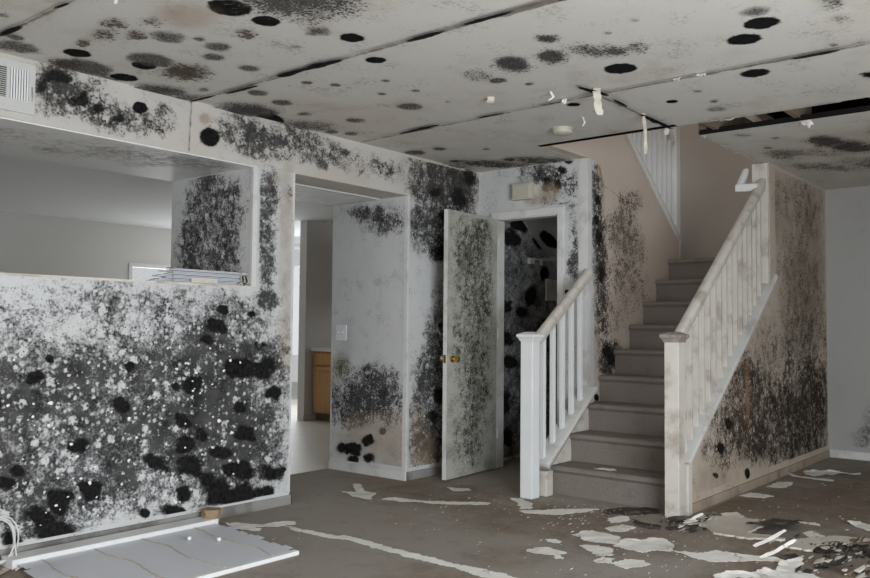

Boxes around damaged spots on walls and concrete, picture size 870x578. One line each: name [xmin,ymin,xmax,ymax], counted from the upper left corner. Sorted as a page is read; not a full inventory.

leakage [35,49,208,138]
leakage [154,32,231,61]
leakage [208,0,280,26]
leakage [340,33,365,42]
leakage [461,32,650,83]
leakage [727,8,780,45]
leakage [741,69,770,77]
leakage [761,135,870,173]
leakage [200,90,578,467]
leakage [592,165,652,374]
leakage [0,171,293,545]
leakage [701,296,828,479]